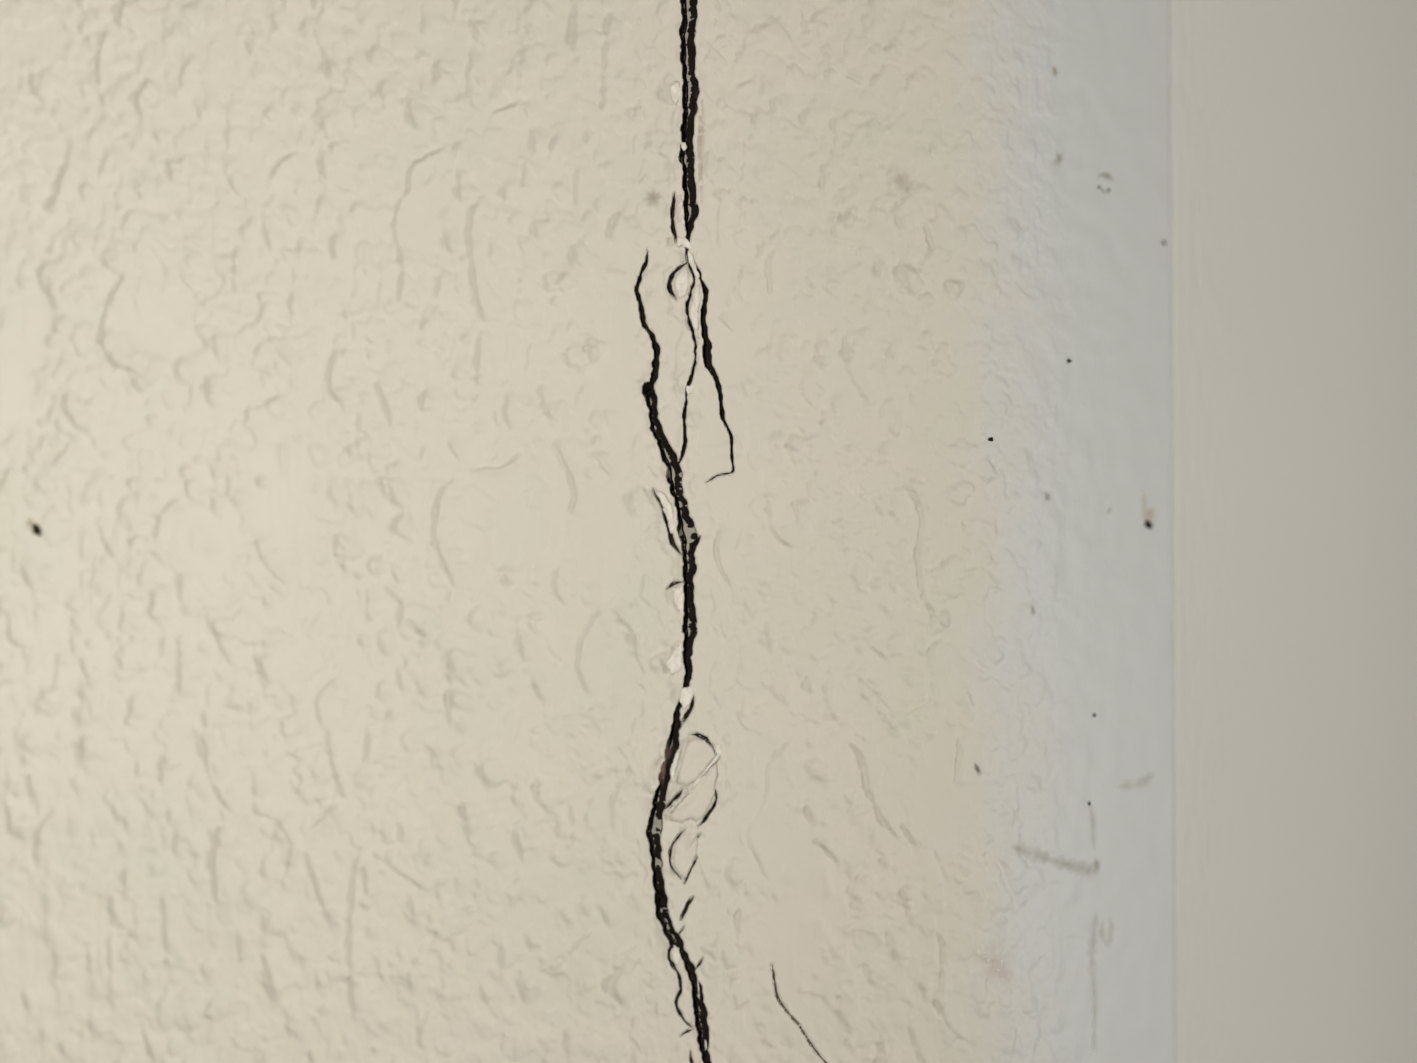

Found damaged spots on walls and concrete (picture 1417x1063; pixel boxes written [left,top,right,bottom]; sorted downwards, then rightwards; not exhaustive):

crack [635,0,734,1063]